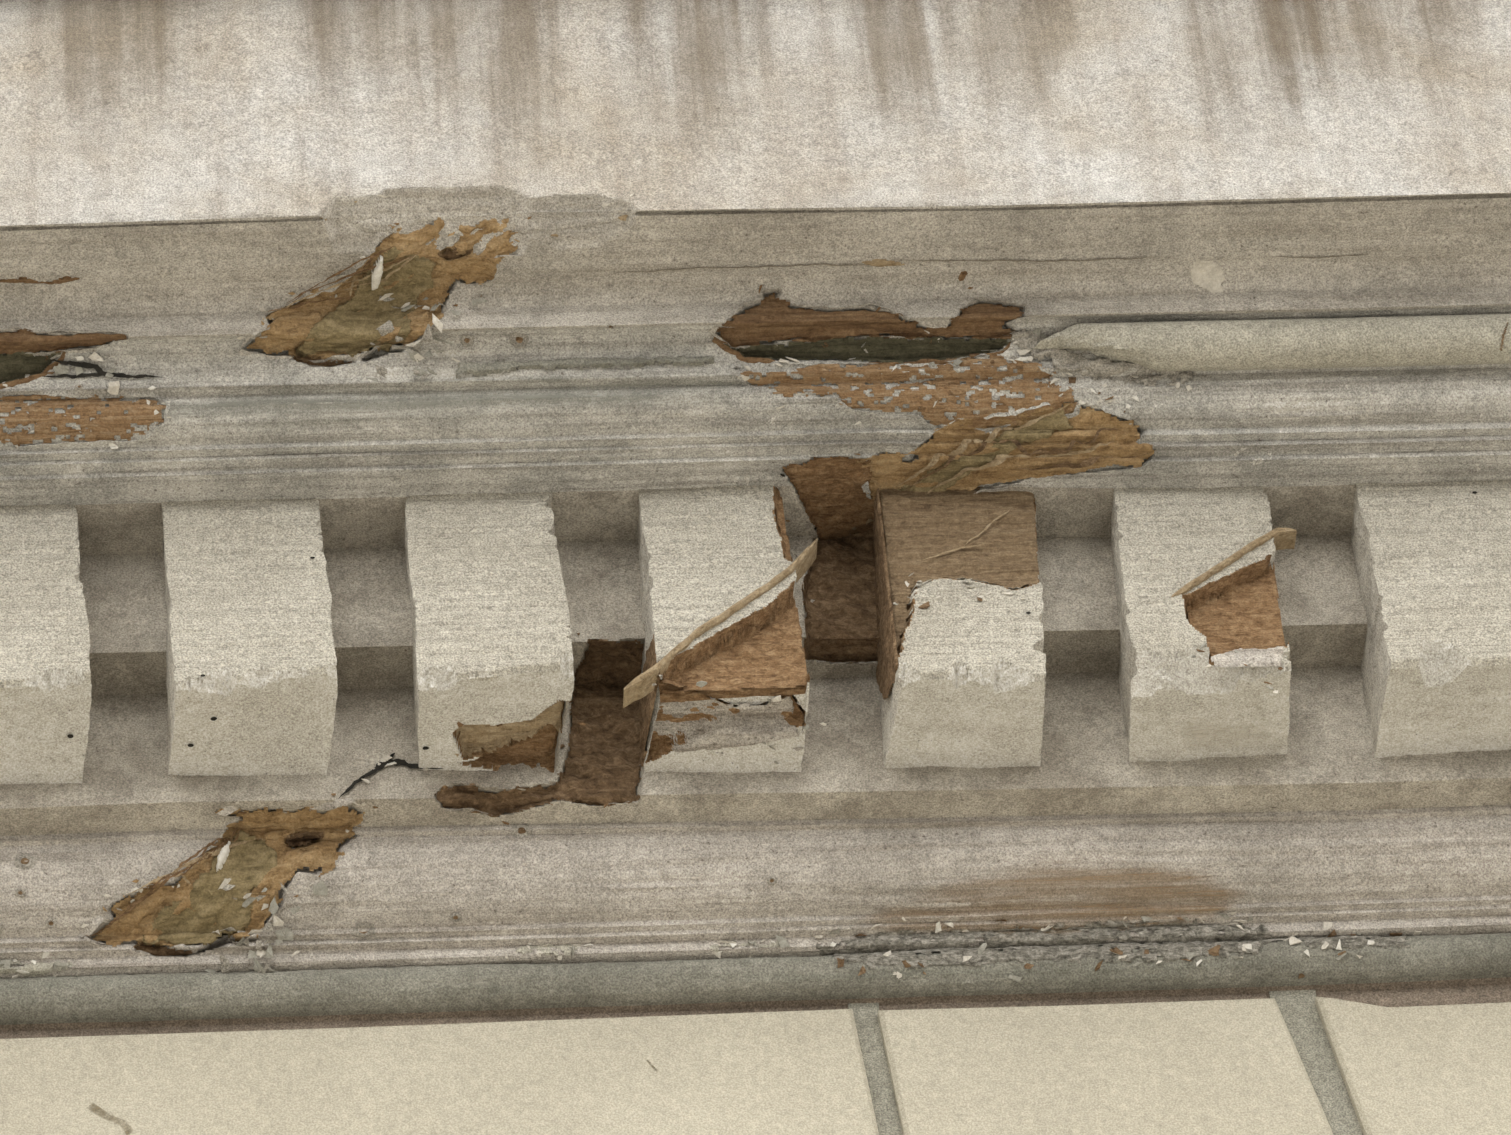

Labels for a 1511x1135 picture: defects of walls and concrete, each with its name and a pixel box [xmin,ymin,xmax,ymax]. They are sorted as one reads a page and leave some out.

spalling [237,184,639,392]
peeling [0,325,174,451]
spalling [434,284,1197,825]
spalling [1171,527,1297,694]
crack [338,753,443,799]
spalling [78,793,378,974]